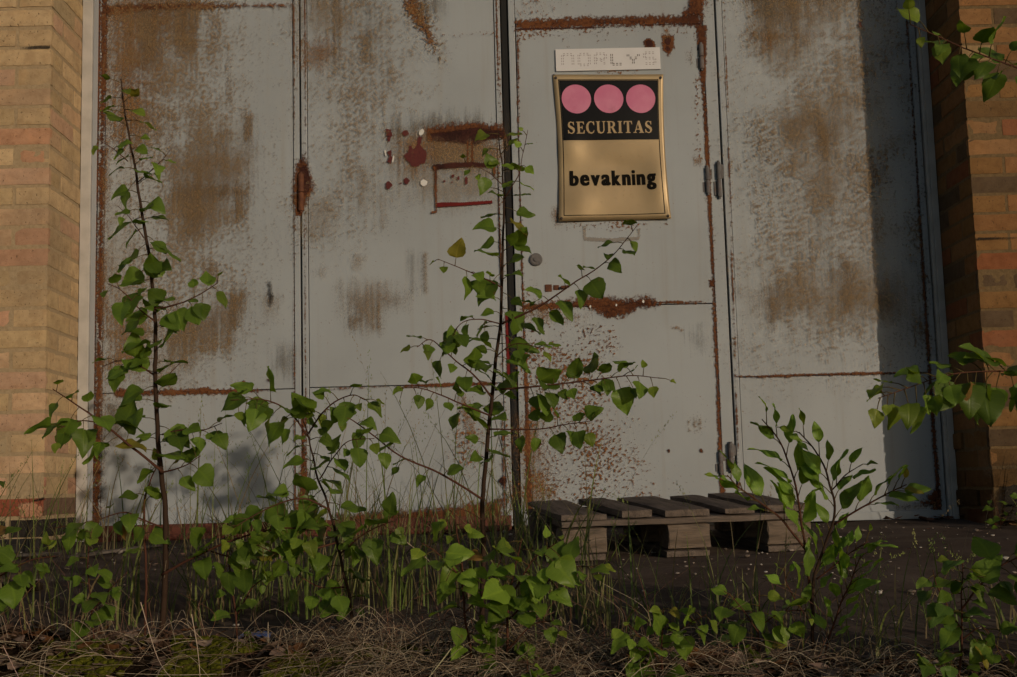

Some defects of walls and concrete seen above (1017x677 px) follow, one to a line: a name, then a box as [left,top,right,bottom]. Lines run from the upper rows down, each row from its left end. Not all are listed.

corrosion [92,0,722,524]
corrosion [734,336,896,449]
corrosion [901,19,933,395]
corrosion [896,412,944,519]